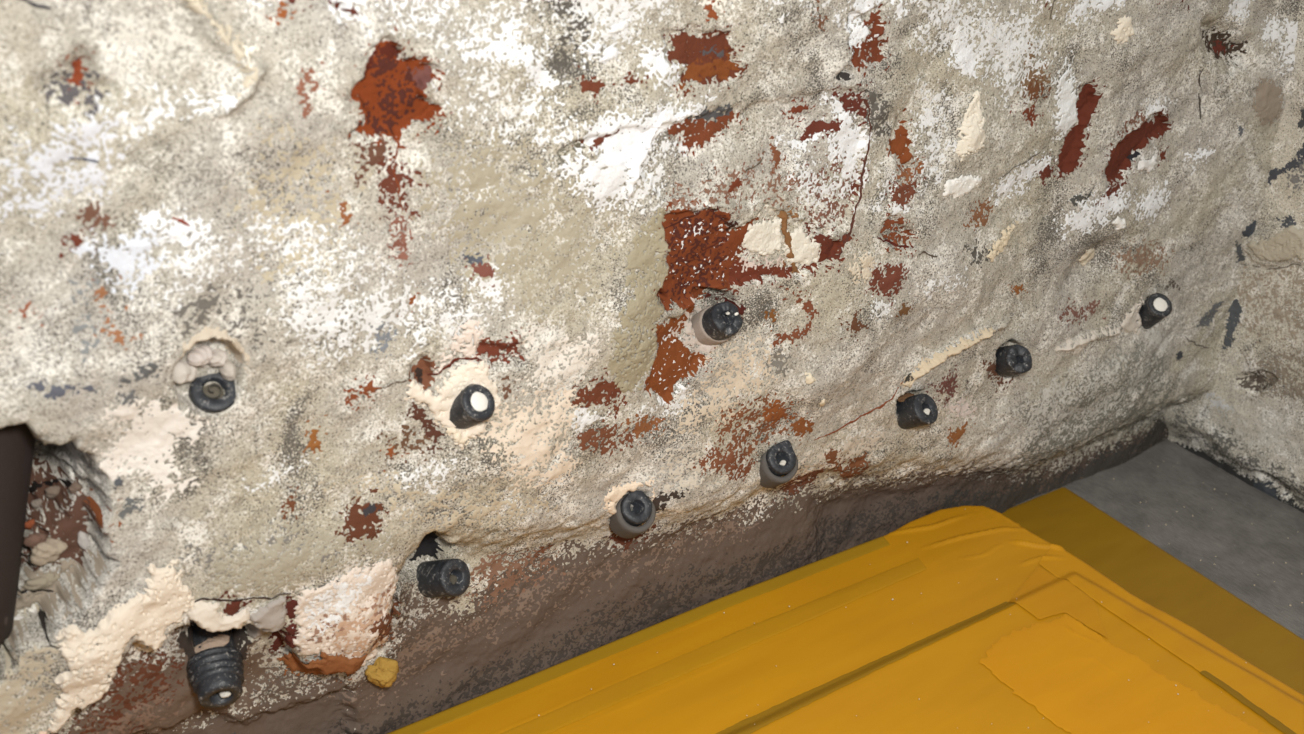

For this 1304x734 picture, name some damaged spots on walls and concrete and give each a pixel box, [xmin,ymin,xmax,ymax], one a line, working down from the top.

rust [673,47,746,94]
rust [357,48,434,268]
rust [1114,107,1147,139]
flaking render [568,0,926,463]
rust [686,390,815,476]
flaking render [281,486,304,528]
flaking render [329,481,390,547]
damp [55,323,1304,734]
peeling [39,559,406,734]